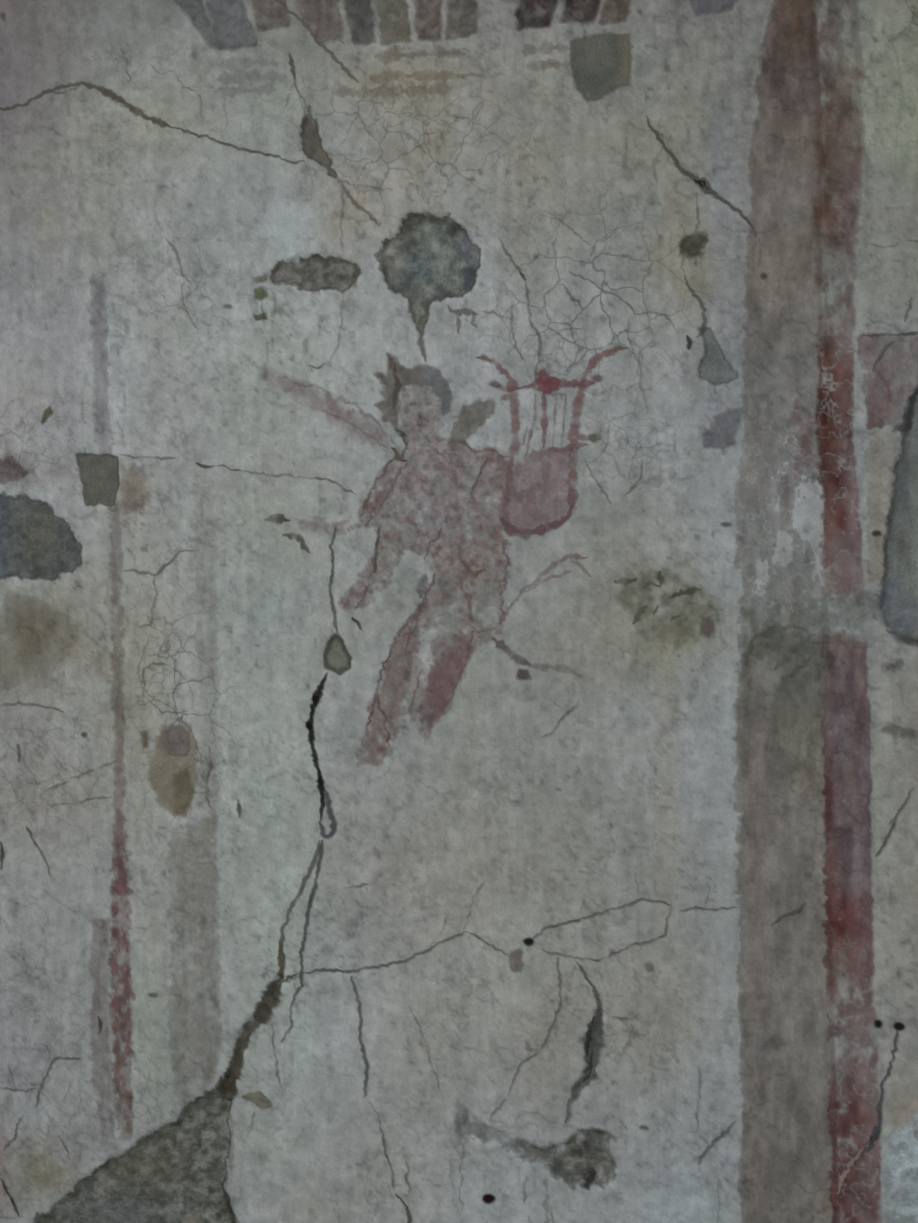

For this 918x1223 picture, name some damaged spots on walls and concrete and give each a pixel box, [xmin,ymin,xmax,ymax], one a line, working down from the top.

crack [0,81,299,163]
crack [646,116,753,228]
spalling [270,253,360,293]
spalling [374,213,480,362]
crack [676,275,706,349]
spalling [879,387,918,645]
crack [215,672,508,1101]
crack [532,898,731,1124]
spalling [34,1073,271,1223]
crack [382,1133,411,1223]
crack [837,1029,898,1194]
water stain [883,1113,918,1223]